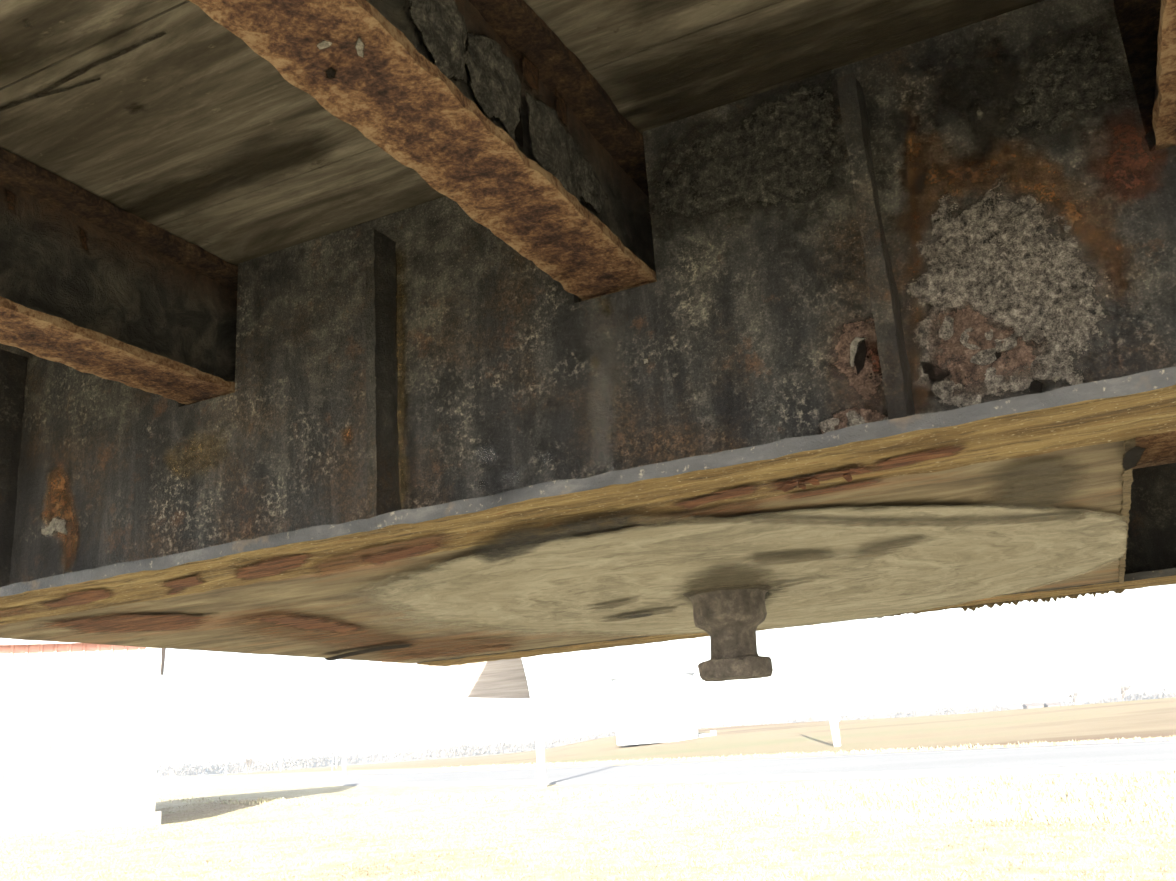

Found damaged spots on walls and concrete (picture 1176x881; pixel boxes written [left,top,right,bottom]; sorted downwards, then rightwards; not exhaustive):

peeling [409,0,608,214]
peeling [902,177,1115,410]
corrosion [41,469,78,568]